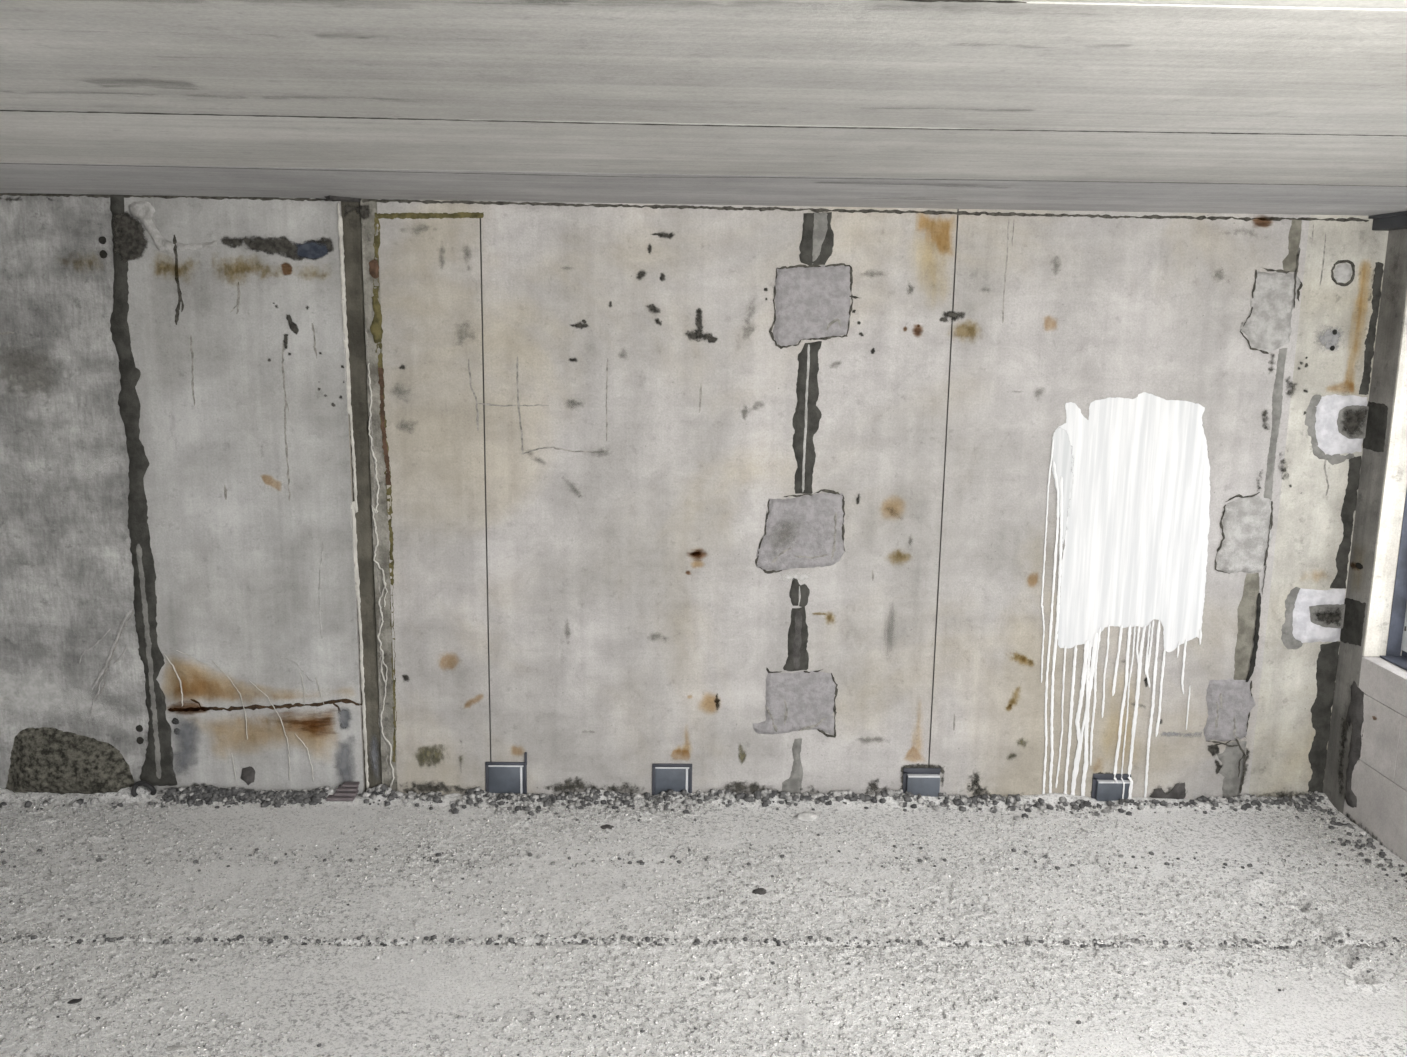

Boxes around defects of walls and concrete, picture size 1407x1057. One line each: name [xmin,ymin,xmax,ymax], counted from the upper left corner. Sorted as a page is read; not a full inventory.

spalling [297,242,328,259]
crack [168,323,395,787]
corrosion [170,705,206,713]
corrosion [292,718,330,729]